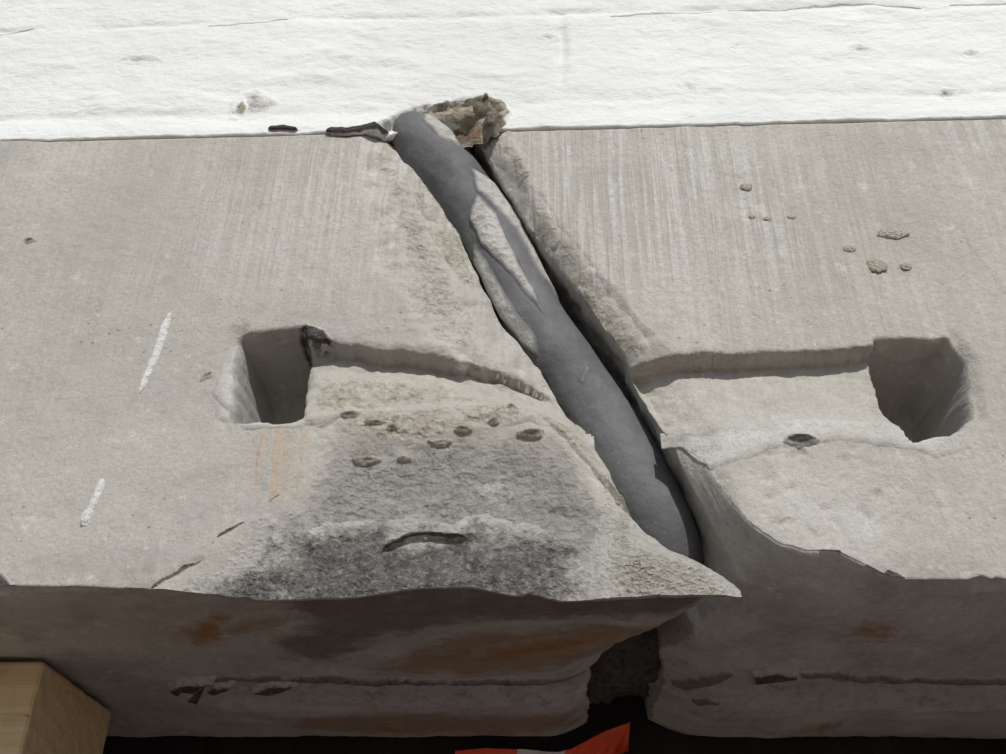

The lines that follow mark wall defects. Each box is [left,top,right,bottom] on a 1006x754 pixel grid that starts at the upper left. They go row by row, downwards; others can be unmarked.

spalling [415,93,659,386]
spalling [137,135,632,602]
corrosion [167,608,291,647]
damp [264,588,702,680]
crack [215,668,588,687]
crack [670,670,736,706]
crack [798,670,1006,686]